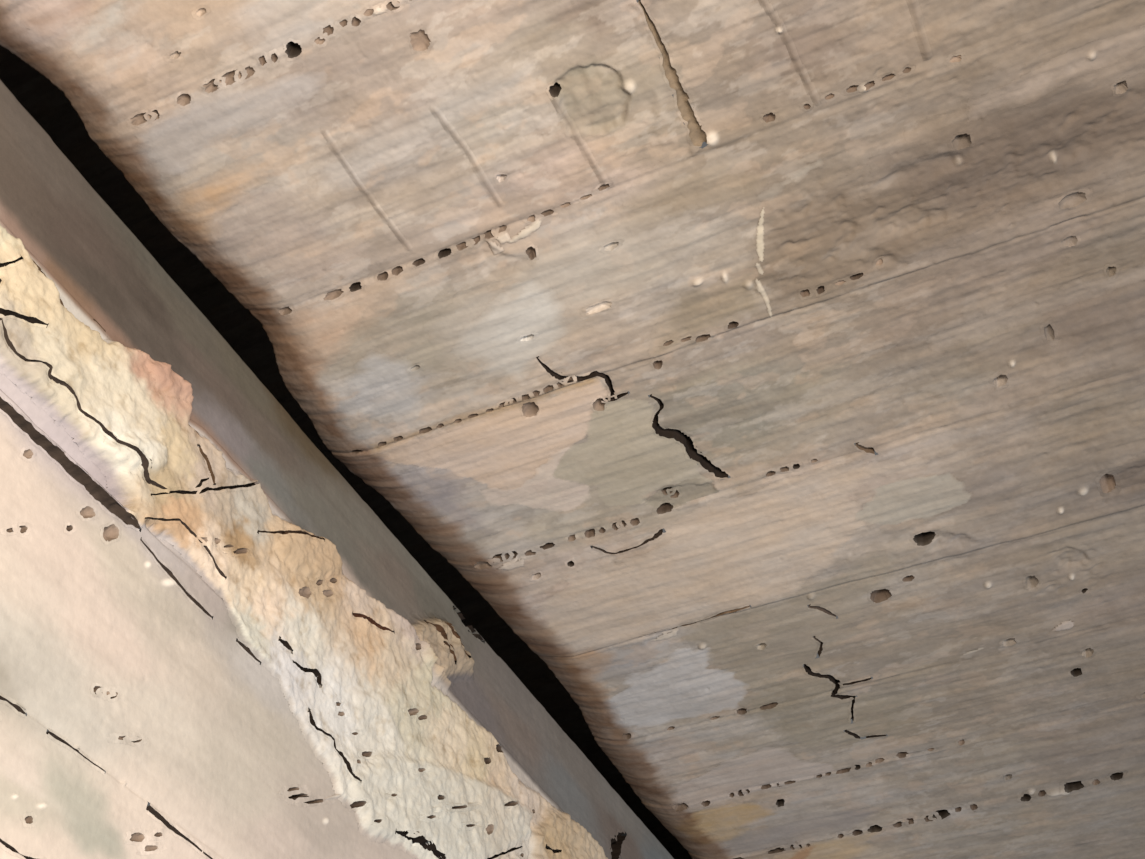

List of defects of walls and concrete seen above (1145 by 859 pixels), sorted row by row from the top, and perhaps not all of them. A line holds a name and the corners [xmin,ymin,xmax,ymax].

spalling [317,180,615,304]
spalling [650,319,742,372]
crack [0,254,261,581]
crack [534,356,730,480]
flaking render [0,225,628,859]
crack [593,527,664,556]
peeling [468,456,931,649]
crack [278,636,362,783]
crack [352,610,394,635]
crack [802,604,887,740]
crack [395,827,448,859]
crack [487,843,561,859]